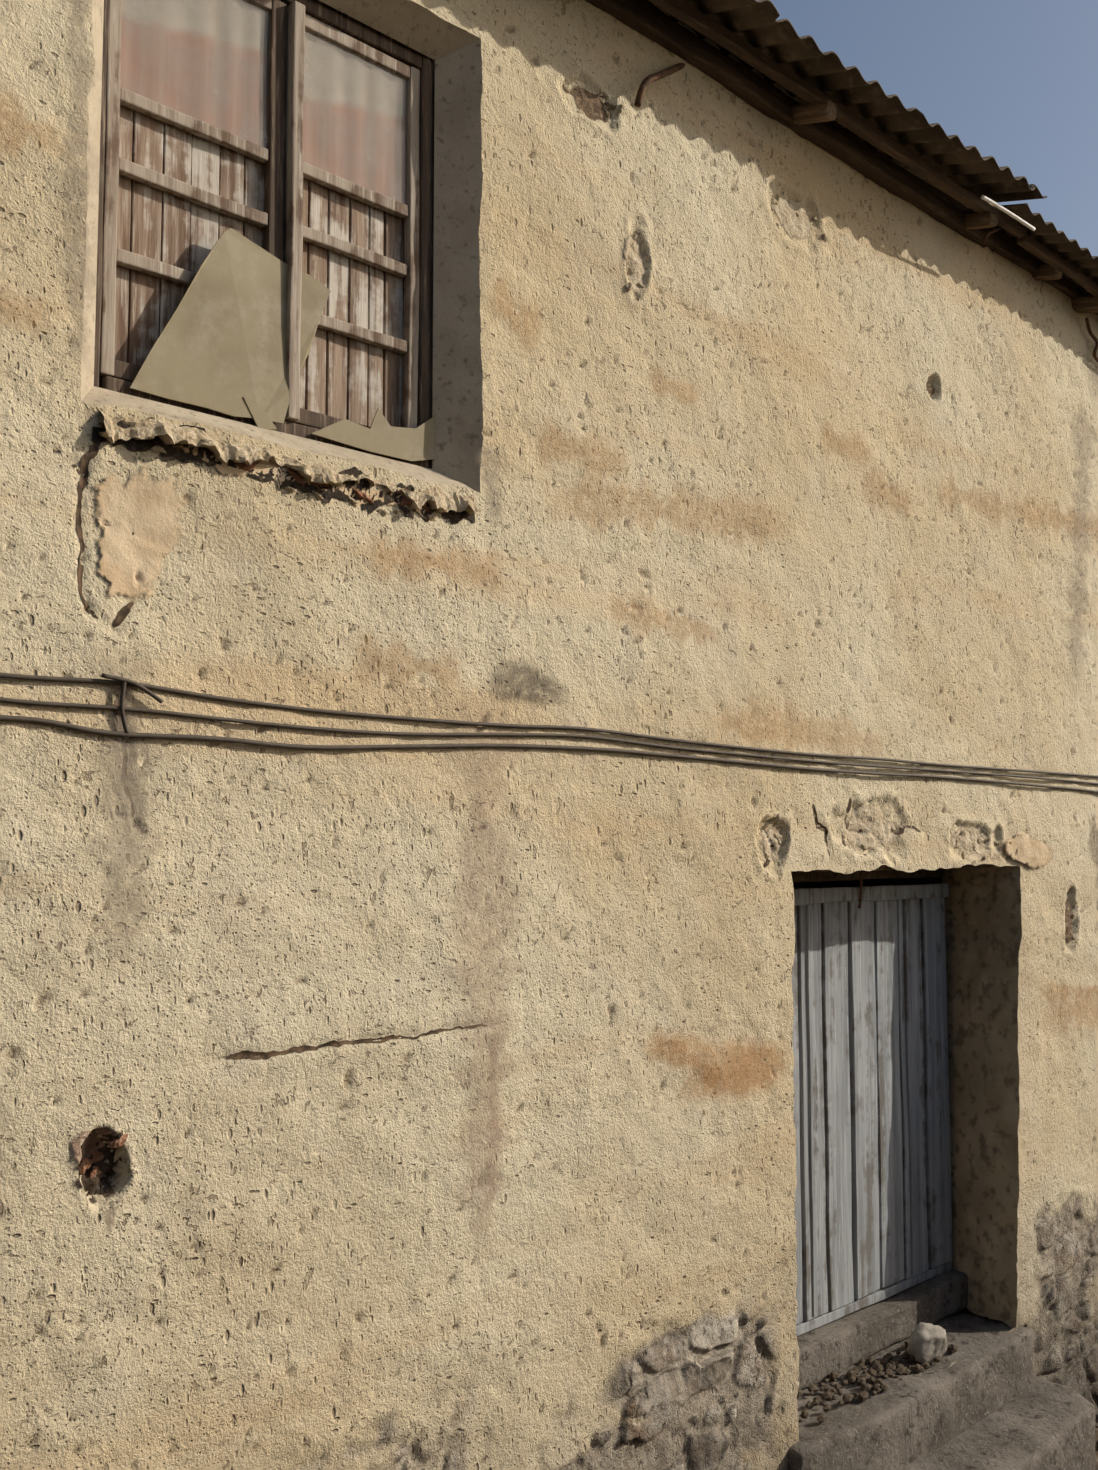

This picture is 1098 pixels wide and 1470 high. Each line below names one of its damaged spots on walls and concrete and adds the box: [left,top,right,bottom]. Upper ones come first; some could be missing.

crack [72,441,134,627]
crack [113,694,135,818]
crack [219,1024,487,1060]
spalling [72,1129,128,1210]